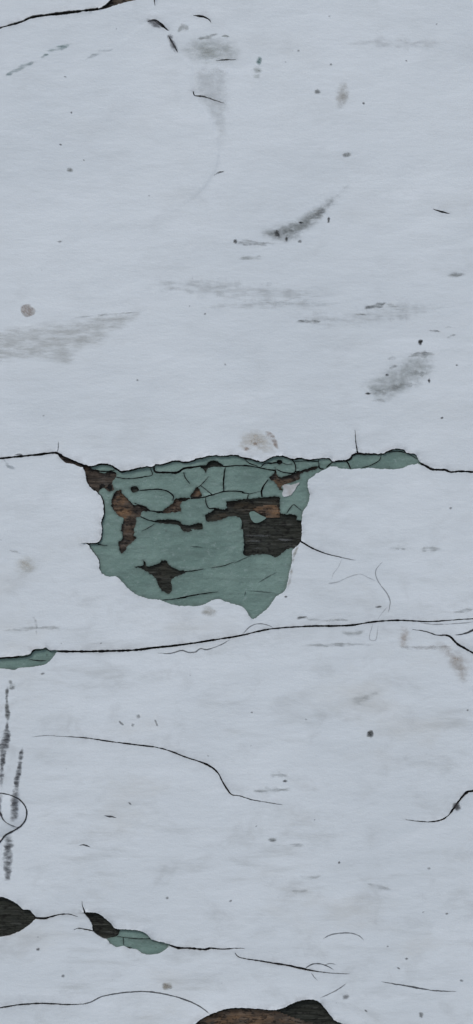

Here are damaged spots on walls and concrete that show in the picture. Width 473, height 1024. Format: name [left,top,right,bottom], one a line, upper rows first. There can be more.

crack [0,9,96,29]
crack [0,451,62,459]
peeling [54,448,421,619]
crack [57,618,473,654]
peeling [0,647,57,670]
crack [51,735,276,804]
crack [406,790,473,822]
peeling [0,897,232,955]
crack [235,953,347,997]
peeling [196,999,342,1024]